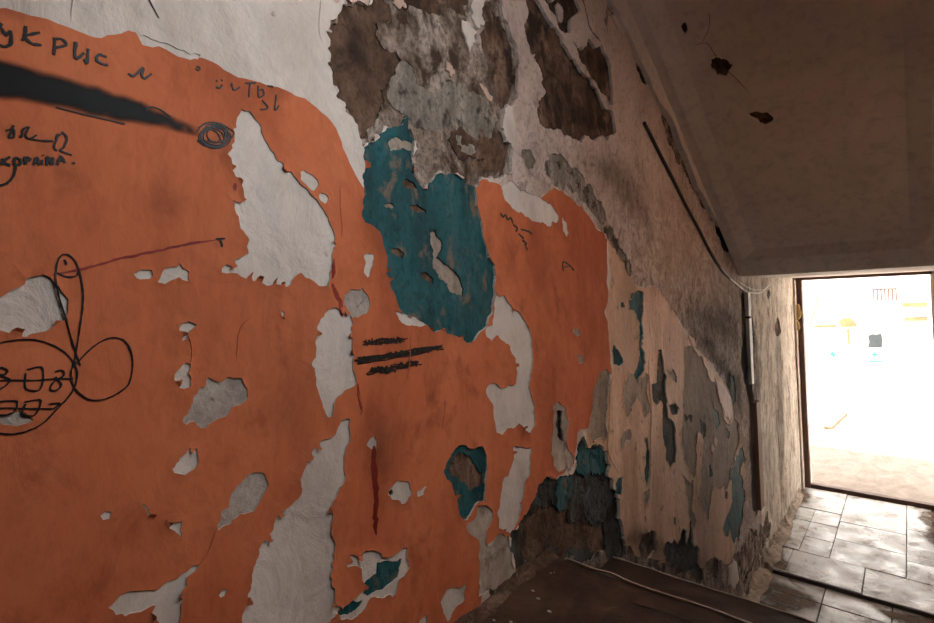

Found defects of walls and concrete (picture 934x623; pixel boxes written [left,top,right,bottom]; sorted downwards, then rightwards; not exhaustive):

spalling [524,0,613,142]
peeling [222,110,337,287]
spalling [326,0,568,434]
spalling [521,149,631,276]
peeling [0,275,68,337]
spalling [172,363,248,428]
spalling [217,472,268,529]
peeling [242,418,408,623]
peeling [312,289,369,417]
peeling [388,481,426,503]
spalling [444,345,623,595]
peeling [620,291,769,589]